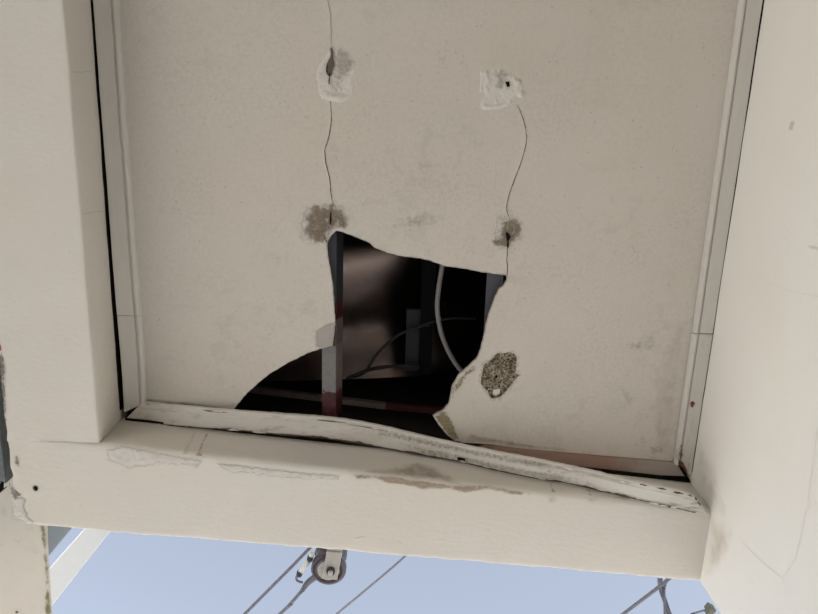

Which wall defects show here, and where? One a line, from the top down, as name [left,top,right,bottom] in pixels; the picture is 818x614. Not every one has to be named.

crack [319,100,334,208]
crack [500,105,527,276]
spalling [236,204,521,450]
peeling [107,446,200,468]
peeling [145,422,701,514]